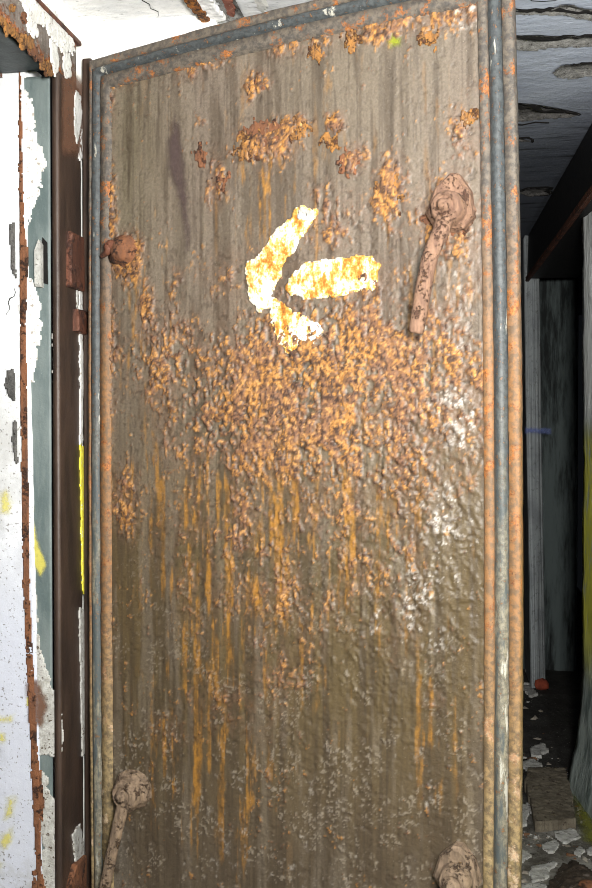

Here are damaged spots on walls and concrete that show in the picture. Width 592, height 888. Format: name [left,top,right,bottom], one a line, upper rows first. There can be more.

corrosion [339,29,363,54]
corrosion [416,24,439,53]
spalling [516,5,592,22]
spalling [516,34,592,51]
corrosion [0,4,83,154]
corrosion [460,108,479,129]
peeling [24,90,47,225]
corrosion [231,115,361,179]
peeling [9,222,17,278]
peeling [18,278,53,382]
peeling [4,369,15,401]
corrosion [18,72,46,888]